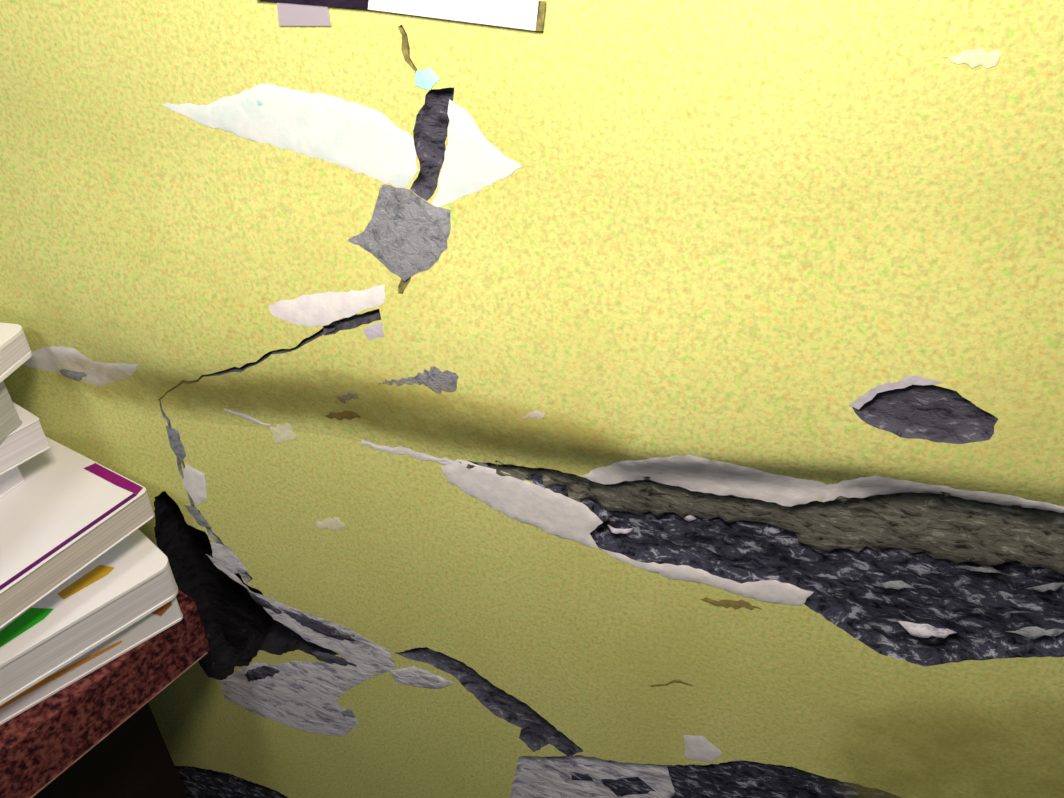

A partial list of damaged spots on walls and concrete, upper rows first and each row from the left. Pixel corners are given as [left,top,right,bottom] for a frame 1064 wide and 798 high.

crack [398,25,418,73]
peeling [160,68,523,281]
peeling [268,284,385,327]
crack [398,277,411,293]
peeling [23,346,138,387]
peeling [378,366,459,394]
flaking render [849,375,998,444]
crack [159,309,384,583]
flaking render [439,455,1064,667]
flaking render [154,491,901,798]